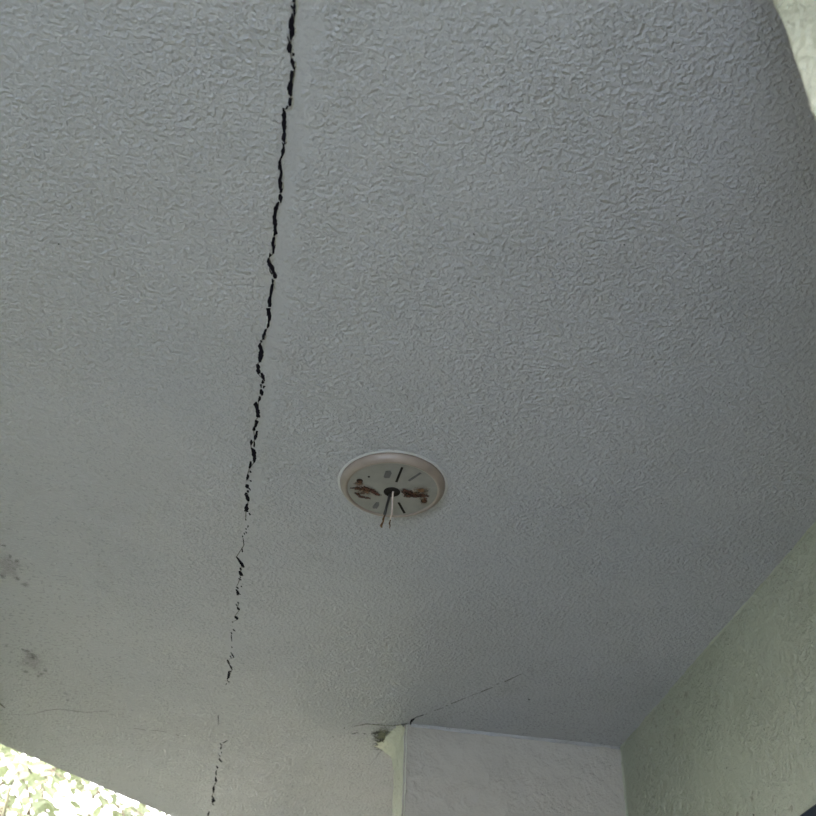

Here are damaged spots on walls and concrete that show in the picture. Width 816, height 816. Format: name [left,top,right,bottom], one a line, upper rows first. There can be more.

crack [225,0,298,685]
crack [410,674,521,725]
crack [207,715,228,816]